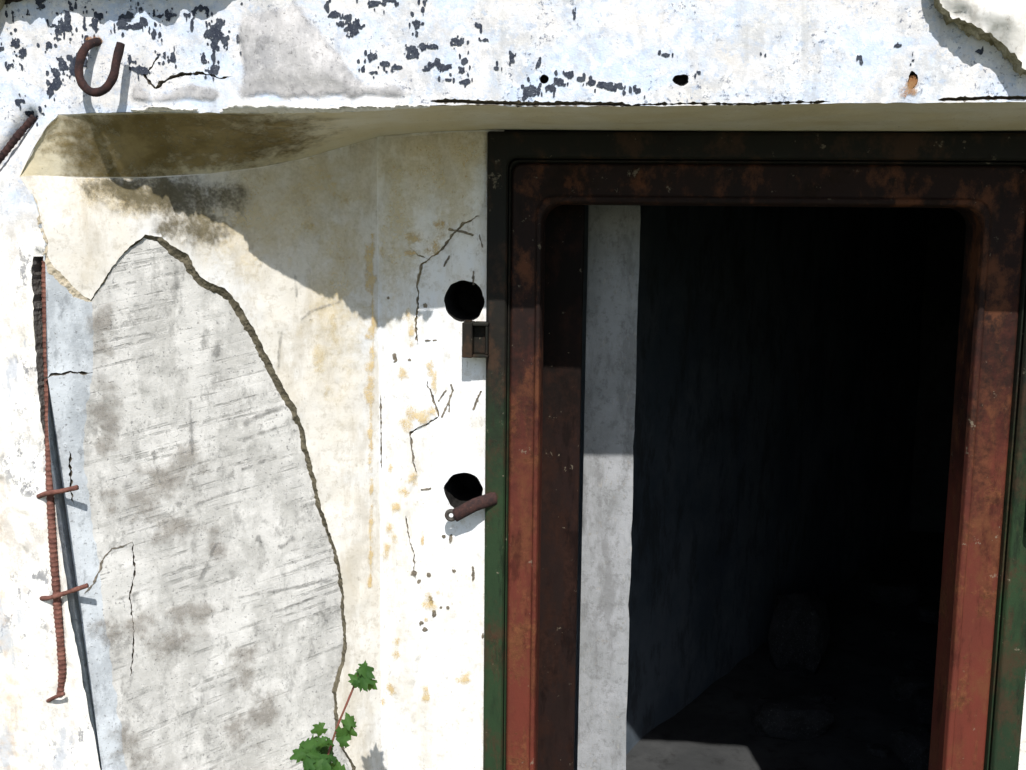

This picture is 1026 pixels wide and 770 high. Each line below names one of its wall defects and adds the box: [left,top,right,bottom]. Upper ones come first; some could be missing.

crack [143,55,228,89]
crack [410,216,478,343]
crack [376,397,384,468]
crack [409,382,439,472]
spalling [31,193,356,770]
crack [405,516,416,579]
crack [85,542,136,676]